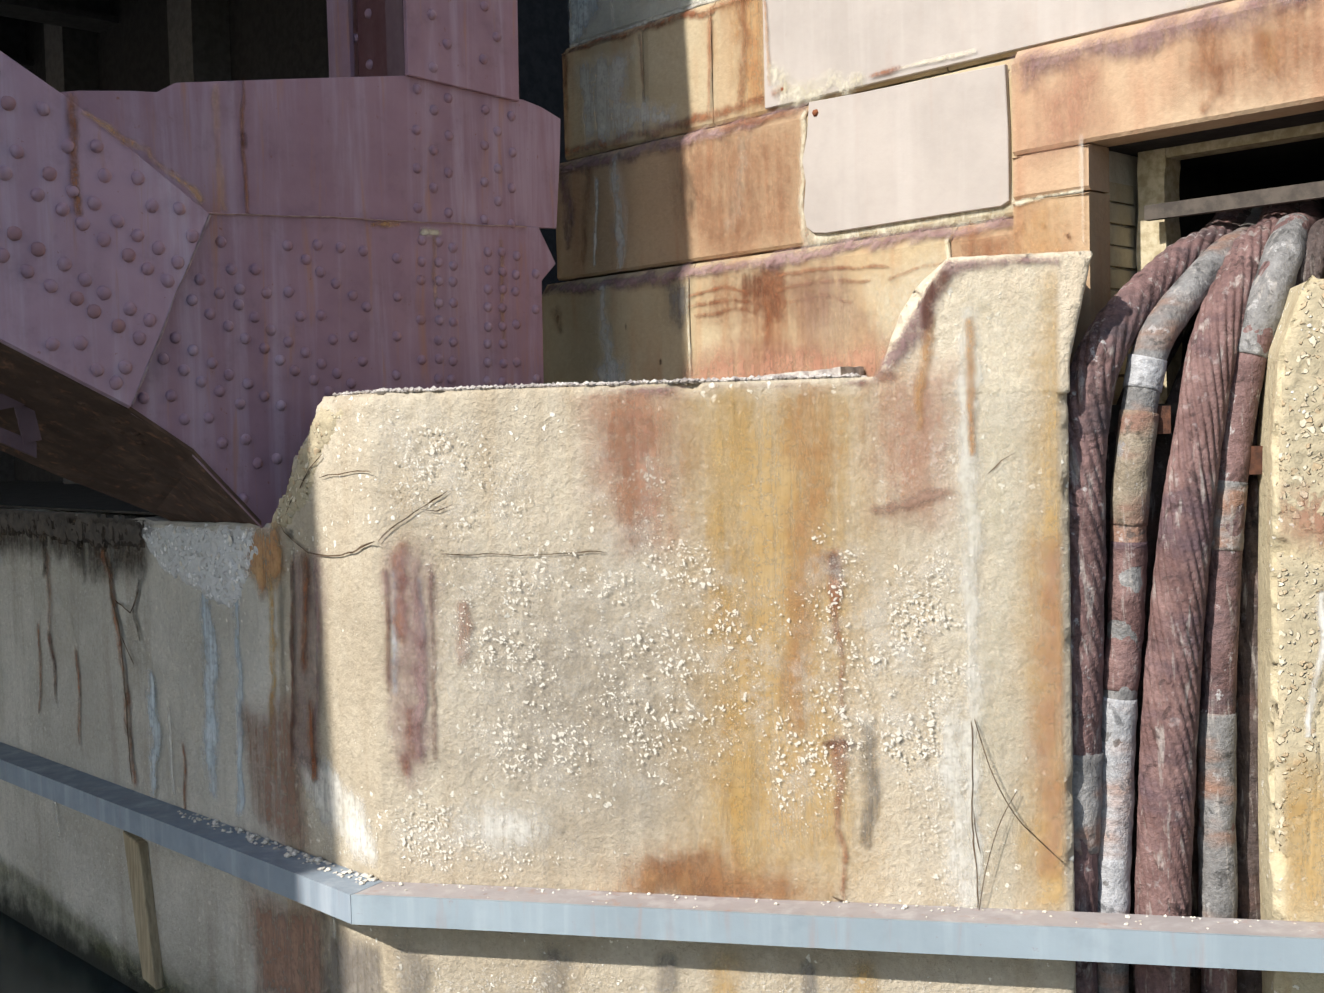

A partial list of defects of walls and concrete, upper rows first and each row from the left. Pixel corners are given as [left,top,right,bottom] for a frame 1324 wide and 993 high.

spalling [1276,281,1324,534]
water stain [0,514,149,577]
rust [248,527,319,780]
crack [281,455,454,606]
rust [384,546,432,774]
rust [545,211,1069,904]
crack [971,722,981,909]